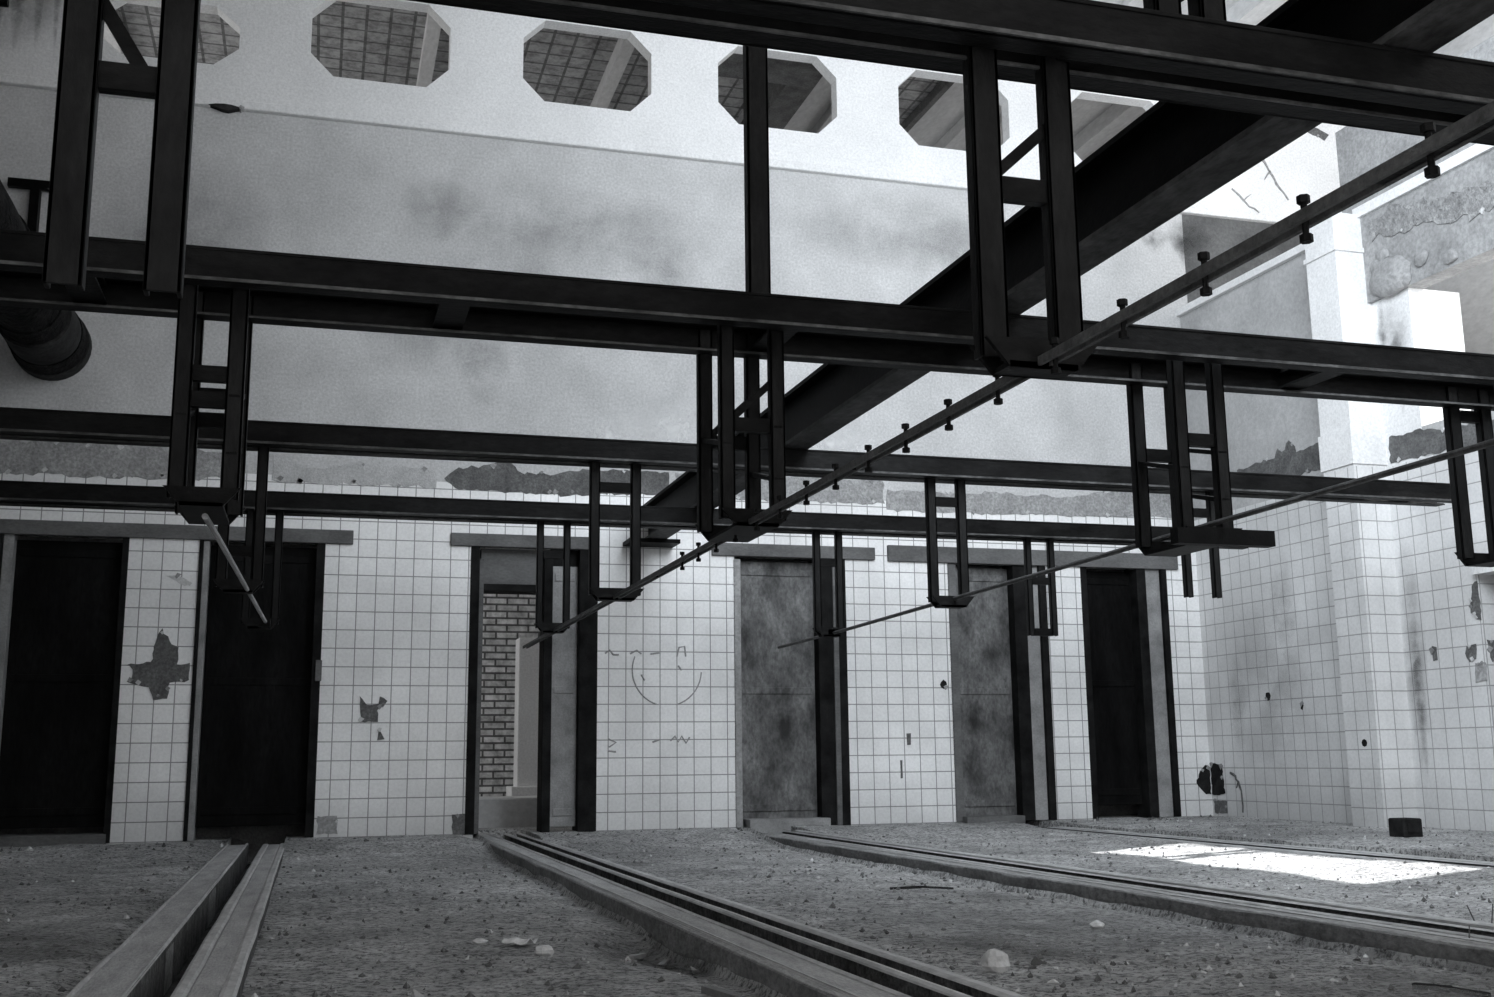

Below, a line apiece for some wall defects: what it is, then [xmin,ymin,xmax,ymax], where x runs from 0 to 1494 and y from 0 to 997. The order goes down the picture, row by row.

spalling [1469,581,1481,620]
spalling [127,628,190,700]
spalling [1465,640,1494,683]
spalling [358,697,387,740]